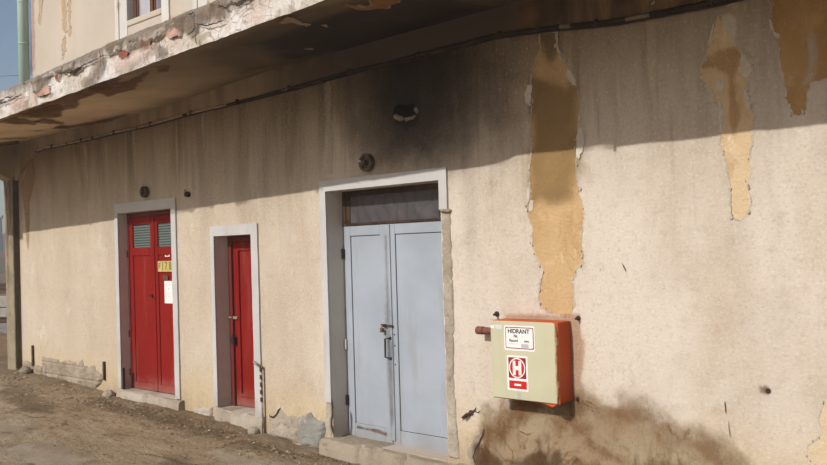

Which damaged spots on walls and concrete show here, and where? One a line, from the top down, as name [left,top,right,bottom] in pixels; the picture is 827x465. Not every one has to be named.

spalling [23,0,84,99]
crack [60,51,104,75]
leakage [0,40,169,132]
spalling [109,23,184,61]
crack [187,0,246,44]
spalling [210,0,252,9]
spalling [342,0,403,10]
flaking render [697,2,757,221]
flaking render [767,0,827,117]
flaking render [524,31,586,317]
leakage [474,394,742,465]